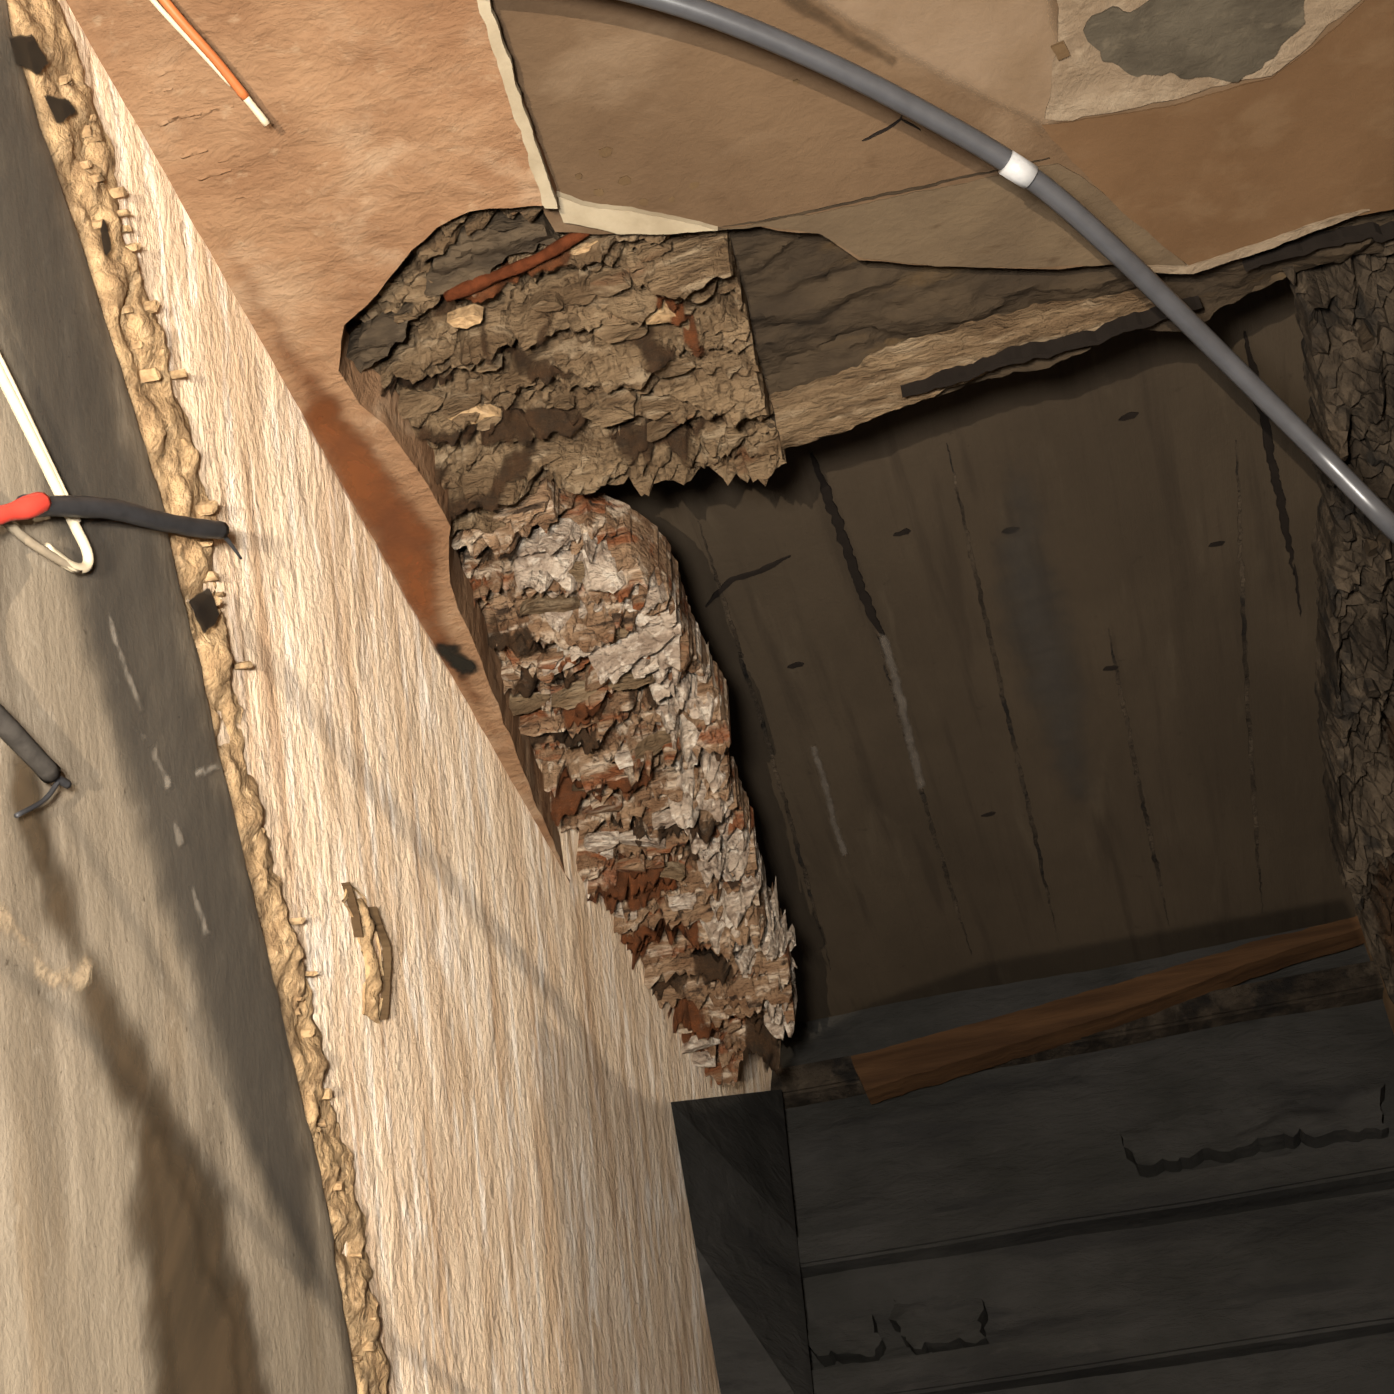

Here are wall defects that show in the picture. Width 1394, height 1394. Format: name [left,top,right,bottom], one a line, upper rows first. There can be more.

flaking render [1038,0,1394,512]
spalling [341,0,1182,1088]
spalling [1311,461,1394,1004]